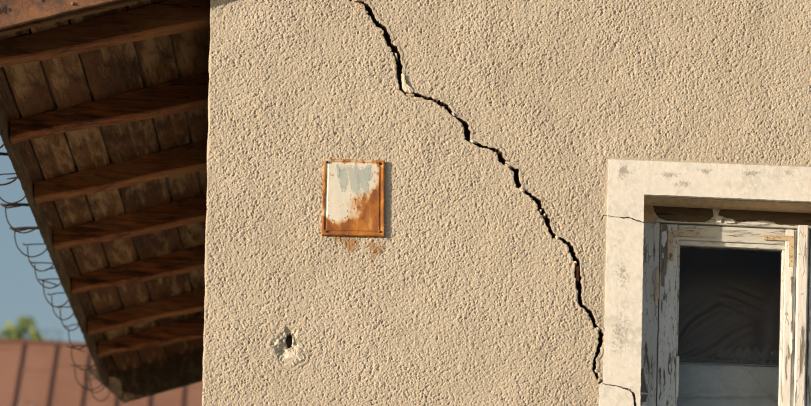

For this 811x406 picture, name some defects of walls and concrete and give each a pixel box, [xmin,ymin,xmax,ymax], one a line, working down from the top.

crack [344,0,636,406]
peeling [644,205,811,300]
spalling [267,323,309,371]
peeling [640,368,649,406]